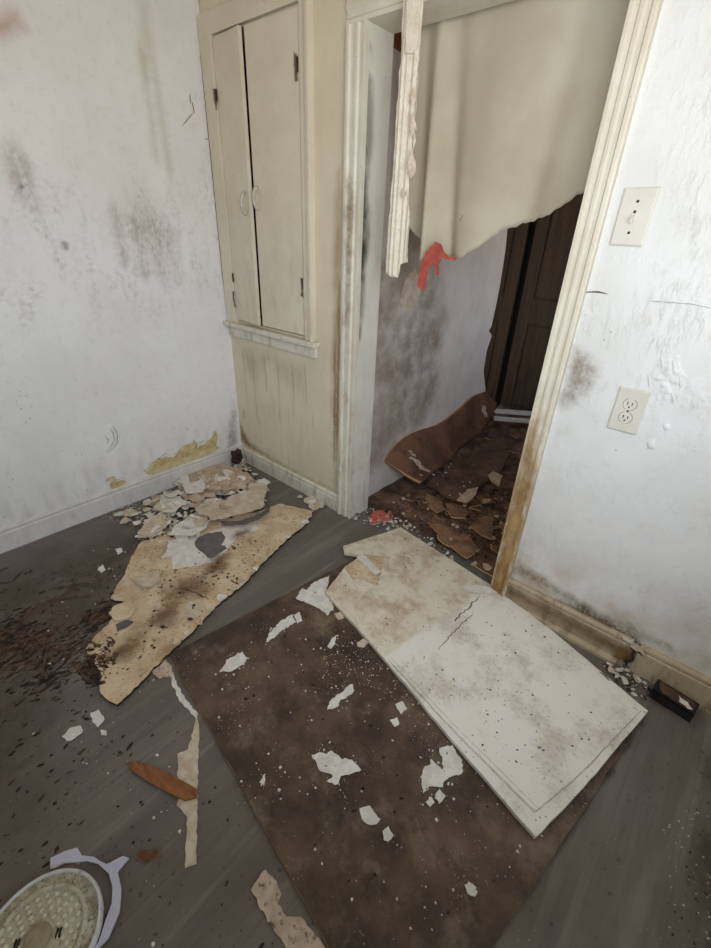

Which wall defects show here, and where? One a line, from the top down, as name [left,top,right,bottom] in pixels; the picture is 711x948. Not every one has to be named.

peeling [143,431,219,475]
peeling [106,476,126,489]
leakage [561,602,640,652]